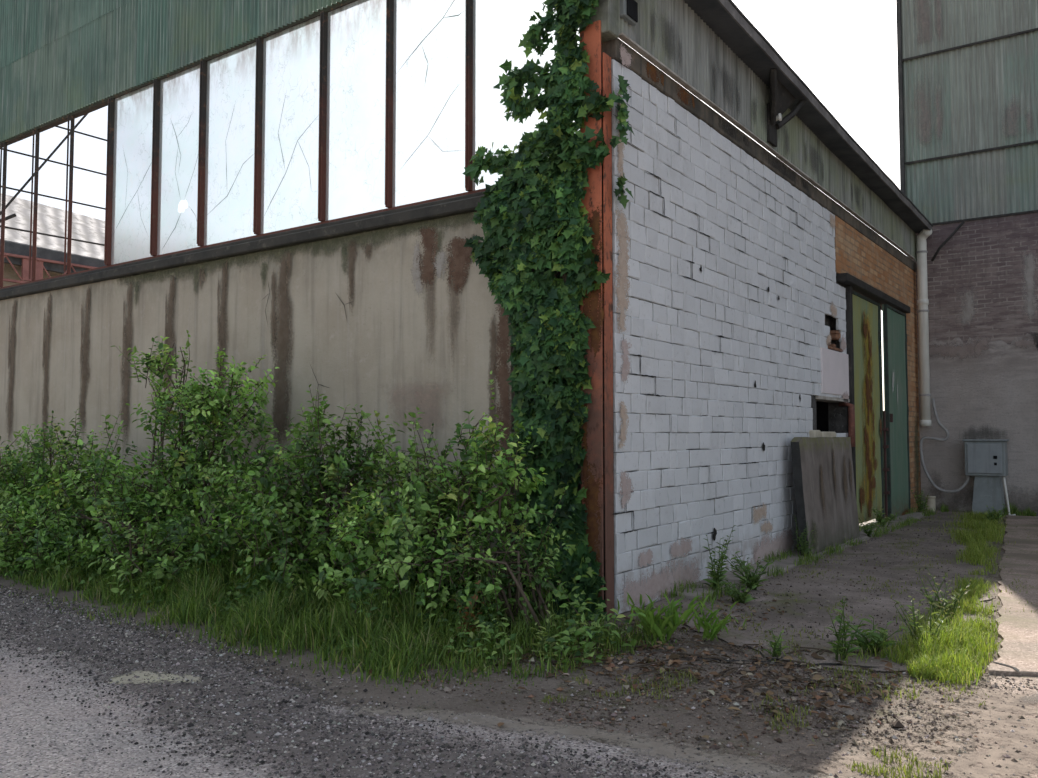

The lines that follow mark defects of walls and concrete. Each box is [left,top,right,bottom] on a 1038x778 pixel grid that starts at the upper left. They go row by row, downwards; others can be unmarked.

damp [719,116,749,146]
damp [764,150,807,188]
damp [6,300,16,439]
damp [42,294,51,434]
damp [79,287,90,429]
damp [120,212,476,449]
peeling [614,206,632,383]
peeling [619,401,629,451]
peeling [619,472,634,508]
spalling [826,330,846,353]
rust [860,311,882,518]
peeling [622,537,701,609]